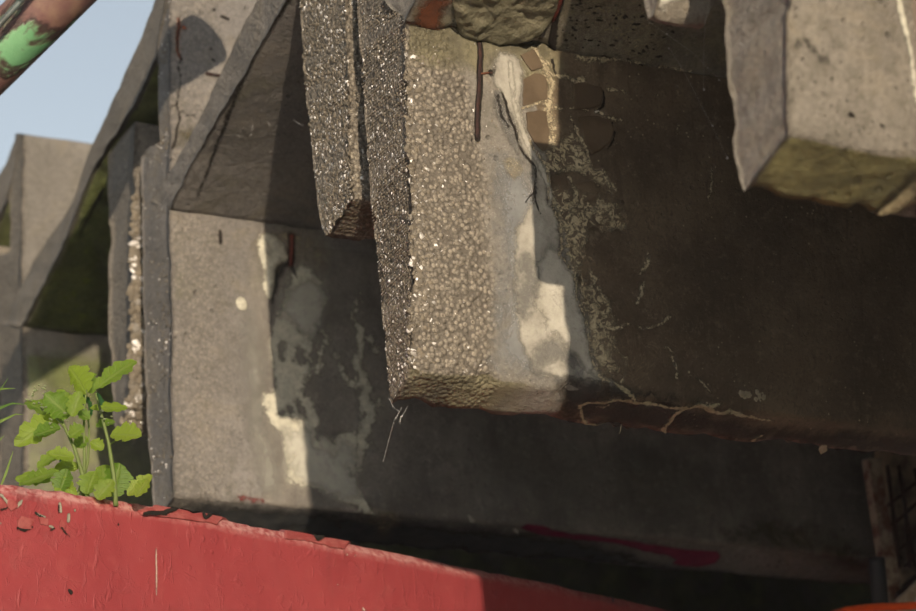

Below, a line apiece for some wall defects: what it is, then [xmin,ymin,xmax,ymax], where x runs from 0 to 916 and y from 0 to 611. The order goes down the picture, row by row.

crack [170,17,195,149]
water stain [494,48,916,455]
spalling [873,173,916,216]
water stain [192,231,682,570]
peeling [0,493,76,537]
flaking render [895,580,916,611]